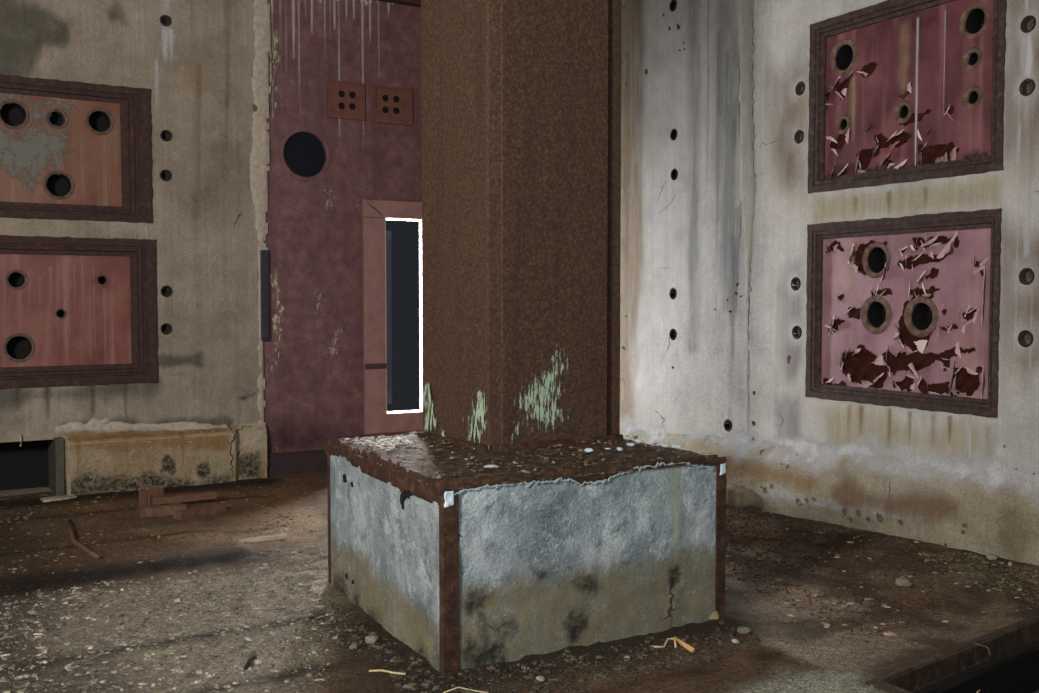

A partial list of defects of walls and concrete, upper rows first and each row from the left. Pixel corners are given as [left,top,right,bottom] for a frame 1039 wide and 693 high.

water stain [311,0,371,83]
peeling [826,109,960,181]
peeling [823,230,988,399]
water stain [64,452,262,495]
crack [228,424,250,477]
peeling [421,384,445,436]
peeling [468,391,489,447]
rust [324,439,735,506]
peeling [511,348,569,440]
water stain [766,427,1039,493]
water stain [459,467,715,668]
crack [663,572,682,628]